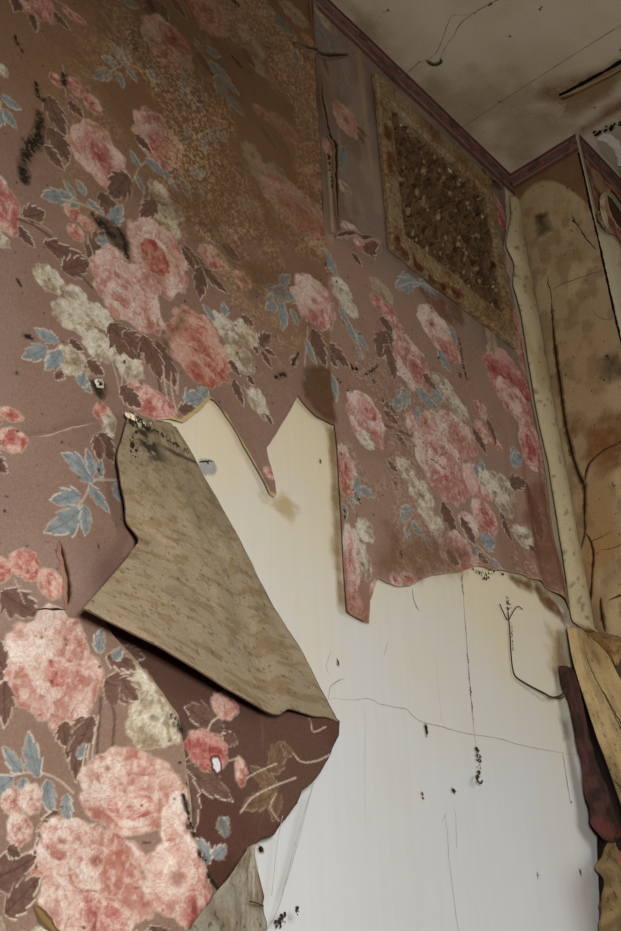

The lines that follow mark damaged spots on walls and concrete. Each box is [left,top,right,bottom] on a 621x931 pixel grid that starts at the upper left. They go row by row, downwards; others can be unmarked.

damp [607,196,621,228]
crack [547,270,621,632]
peeling [82,405,340,931]
peeling [559,627,621,931]